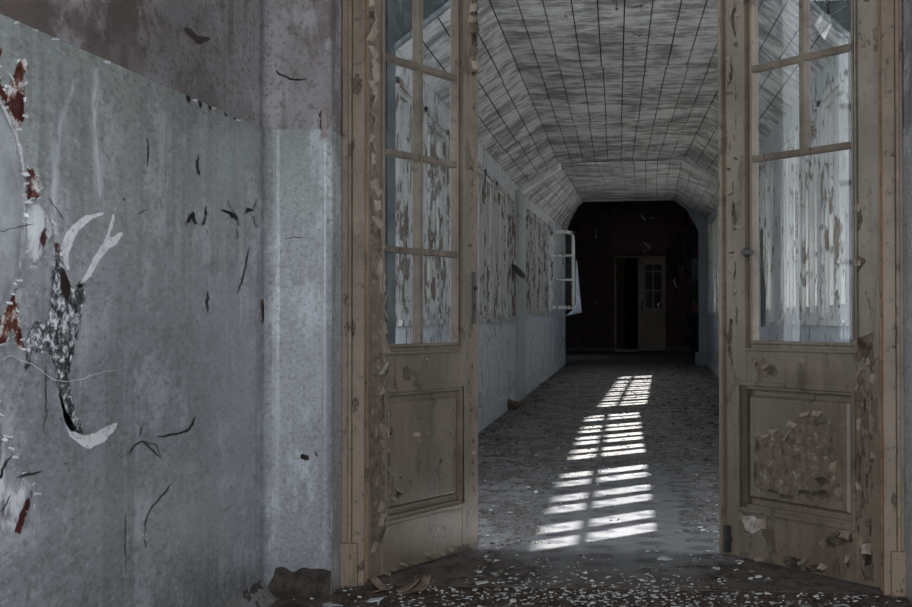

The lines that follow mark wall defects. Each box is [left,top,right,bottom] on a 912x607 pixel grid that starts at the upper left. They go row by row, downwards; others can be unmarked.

peeling [0,48,28,131]
peeling [21,166,63,267]
peeling [0,279,26,351]
peeling [0,428,42,534]